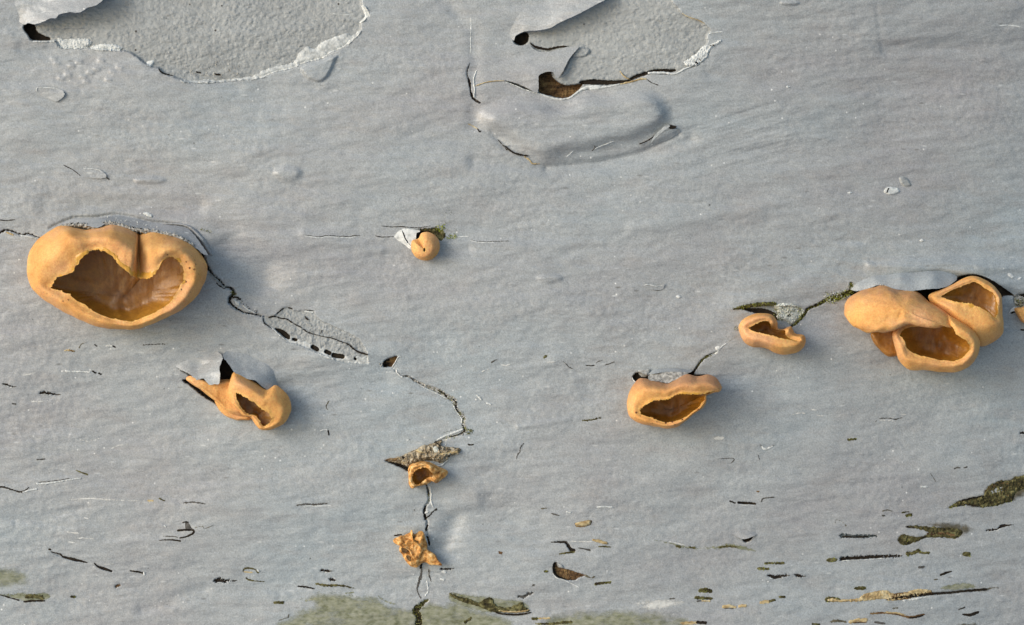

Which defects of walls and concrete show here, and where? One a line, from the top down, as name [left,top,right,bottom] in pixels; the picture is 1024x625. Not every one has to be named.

peeling [15,0,369,84]
peeling [468,0,723,101]
peeling [650,124,680,145]
crack [202,254,264,317]
spalling [263,307,369,364]
peeling [176,351,278,403]
crack [396,369,473,443]
spalling [385,440,461,471]
crack [297,501,331,509]
crack [412,484,437,625]